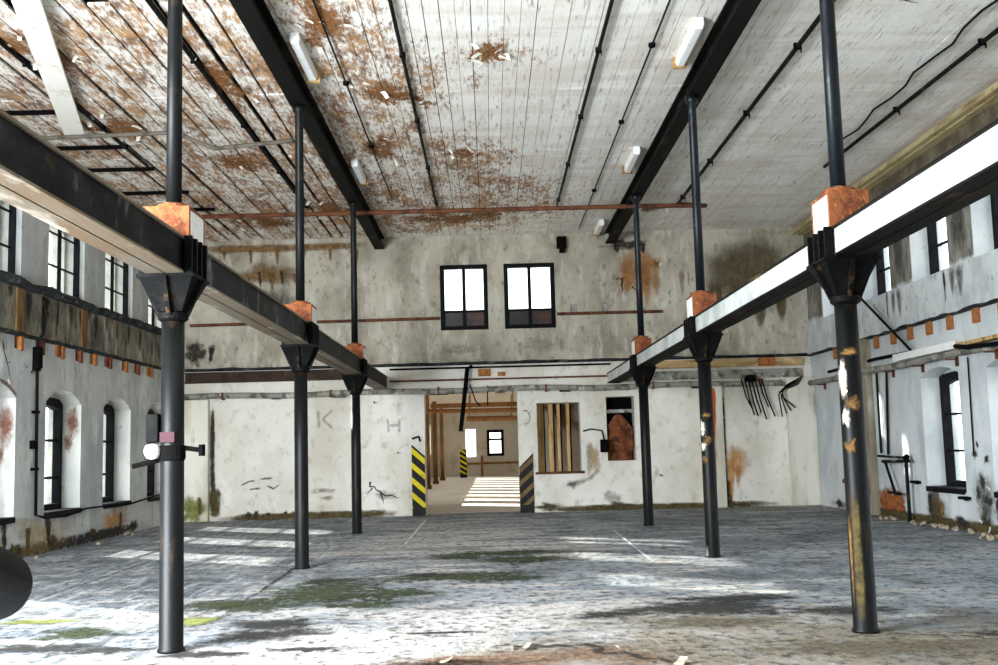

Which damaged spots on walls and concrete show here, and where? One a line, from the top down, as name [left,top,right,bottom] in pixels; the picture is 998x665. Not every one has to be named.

peeling [286,0,354,53]
peeling [58,51,89,88]
peeling [468,41,511,69]
peeling [349,82,433,108]
peeling [84,112,144,141]
peeling [199,147,280,177]
damp [709,244,781,301]
damp [776,299,786,319]
rust [728,452,742,491]
damp [880,492,998,535]
damp [1,519,138,558]
rust [849,499,865,618]